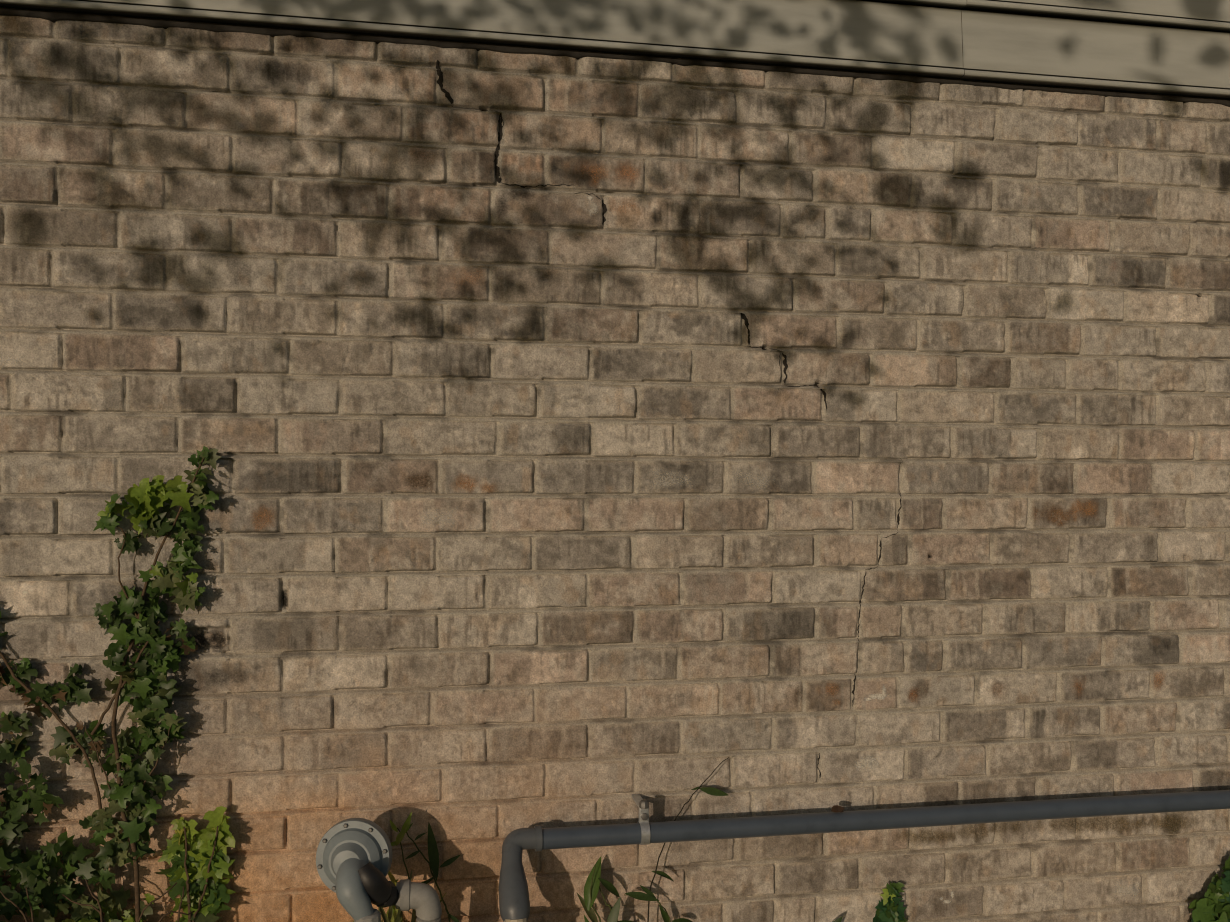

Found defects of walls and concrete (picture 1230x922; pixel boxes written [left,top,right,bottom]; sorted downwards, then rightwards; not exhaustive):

crack [436,60,607,225]
crack [741,313,827,409]
crack [852,461,903,707]